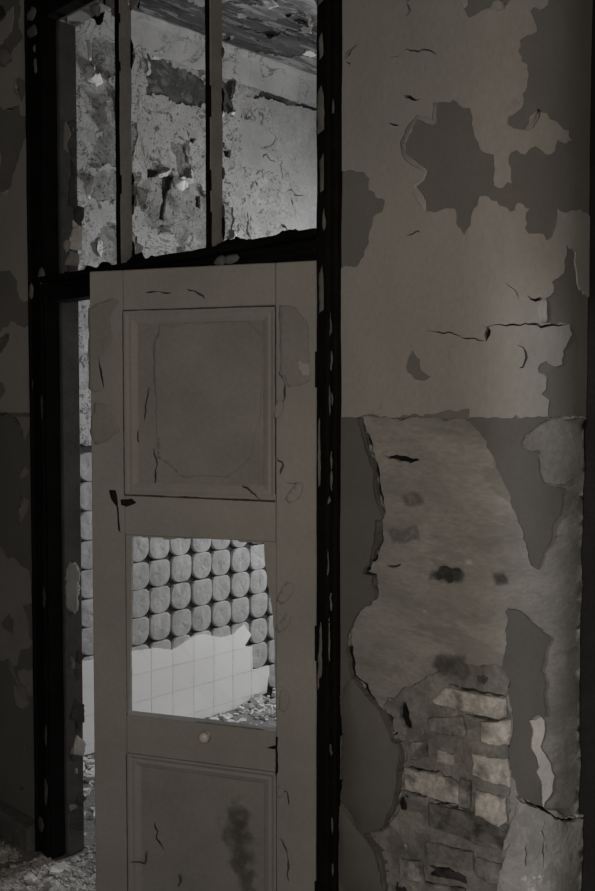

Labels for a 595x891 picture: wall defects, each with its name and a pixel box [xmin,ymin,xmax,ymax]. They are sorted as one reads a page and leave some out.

peeling [90,0,115,25]
peeling [0,77,26,197]
peeling [63,38,154,269]
peeling [131,121,206,253]
spalling [146,50,205,108]
peeling [214,202,250,265]
peeling [341,170,385,268]
peeling [400,0,593,240]
peeling [0,267,45,353]
crack [439,323,560,341]
peeling [0,547,46,696]
spalling [348,245,588,891]